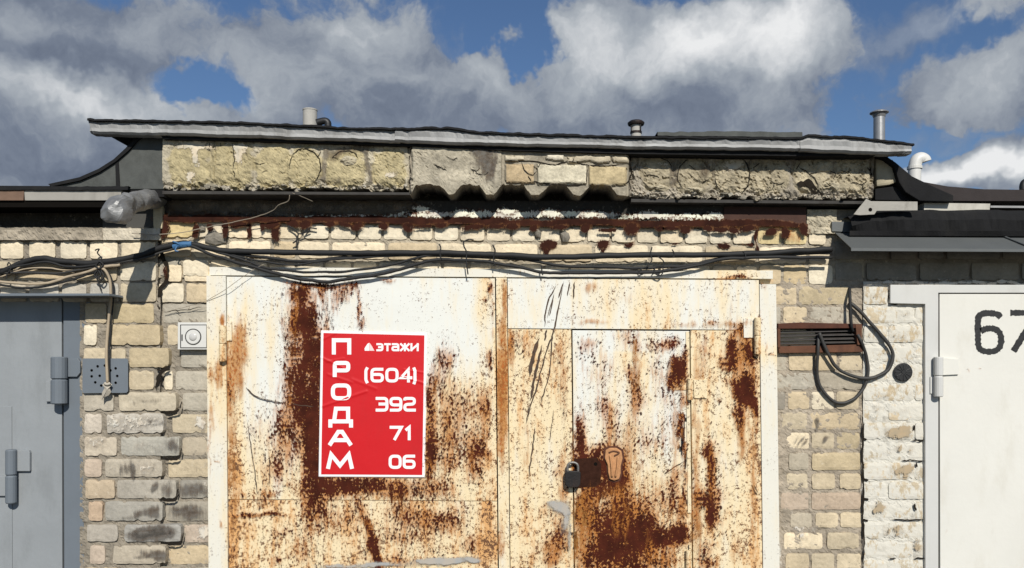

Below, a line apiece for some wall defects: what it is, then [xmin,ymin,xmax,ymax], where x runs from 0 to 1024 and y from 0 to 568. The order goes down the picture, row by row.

crack [209,143,357,183]
spalling [164,183,408,192]
rust [160,213,808,254]
rust [210,322,247,415]
rust [221,279,766,568]